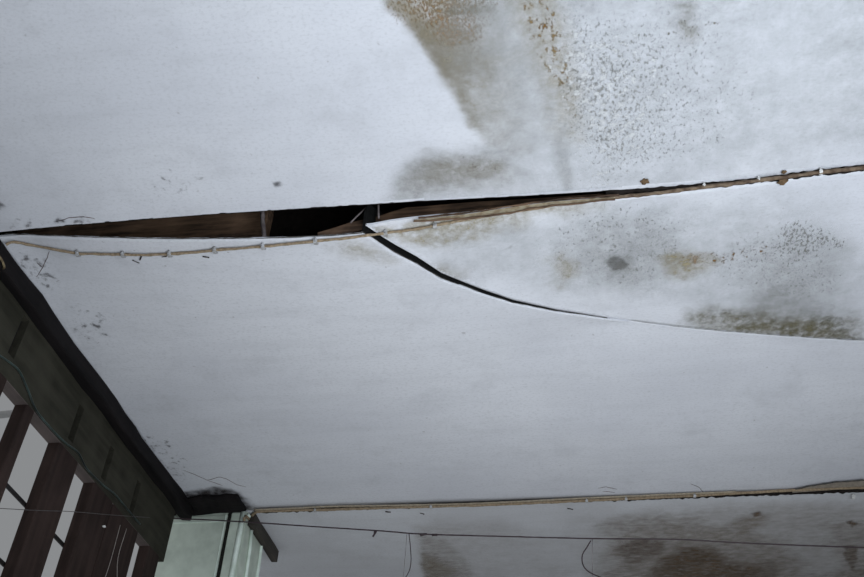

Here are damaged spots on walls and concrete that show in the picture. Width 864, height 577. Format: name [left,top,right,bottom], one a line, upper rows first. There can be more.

water stain [388,0,493,115]
water stain [549,33,679,171]
crack [4,165,864,318]
water stain [699,312,842,338]